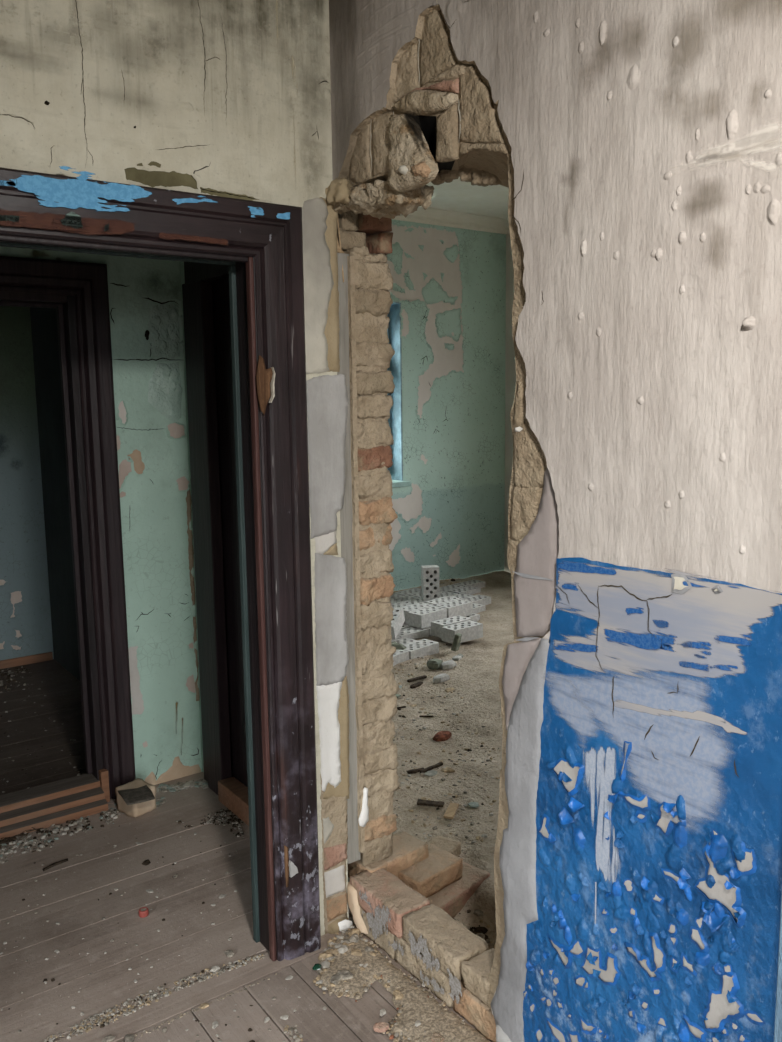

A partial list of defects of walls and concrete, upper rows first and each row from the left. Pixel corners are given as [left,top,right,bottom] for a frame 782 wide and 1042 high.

crack [75,0,93,168]
crack [159,145,255,199]
crack [198,3,227,117]
water stain [697,127,782,169]
spalling [0,10,509,1003]
crack [557,585,672,718]
peeling [502,379,782,1042]